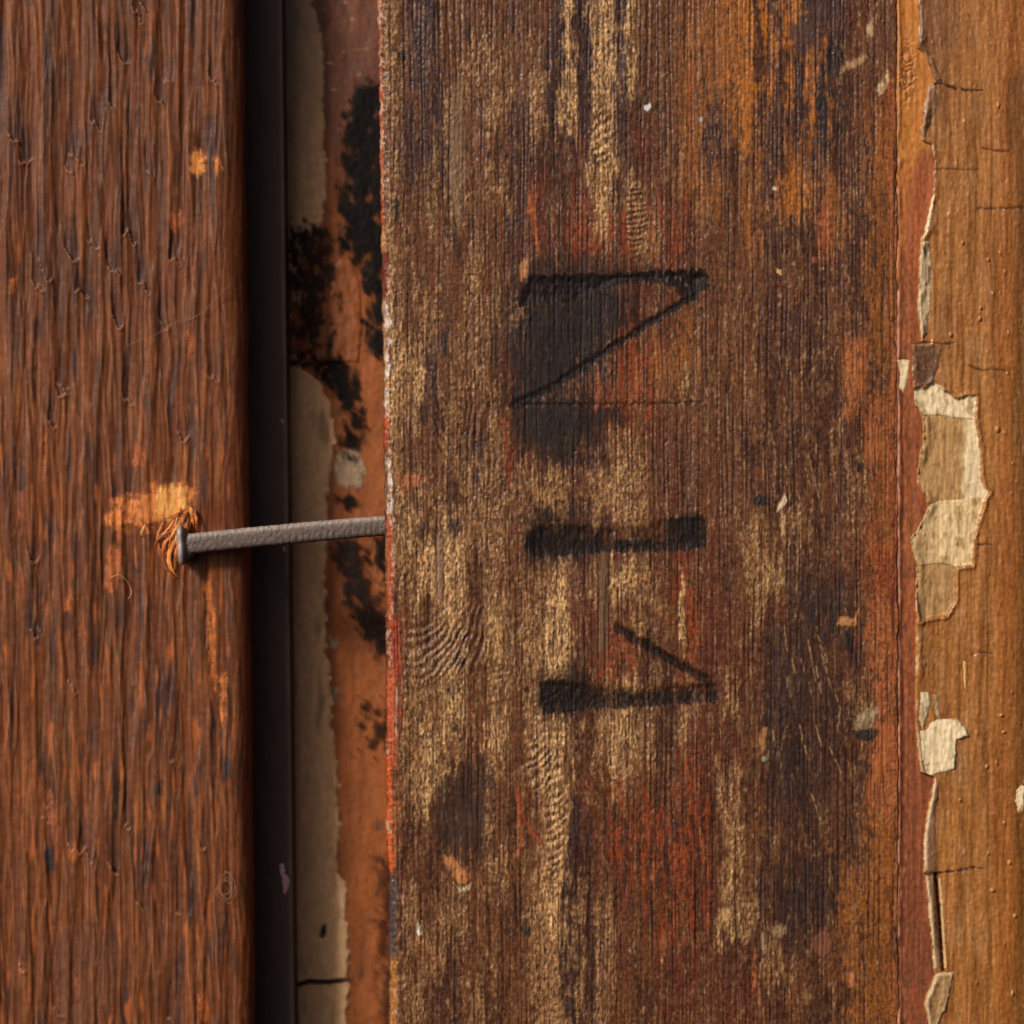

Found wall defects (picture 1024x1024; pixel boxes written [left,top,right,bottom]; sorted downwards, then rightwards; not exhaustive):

peeling [919,5,941,138]
leakage [288,76,384,461]
peeling [897,195,989,621]
peeling [916,692,969,1024]